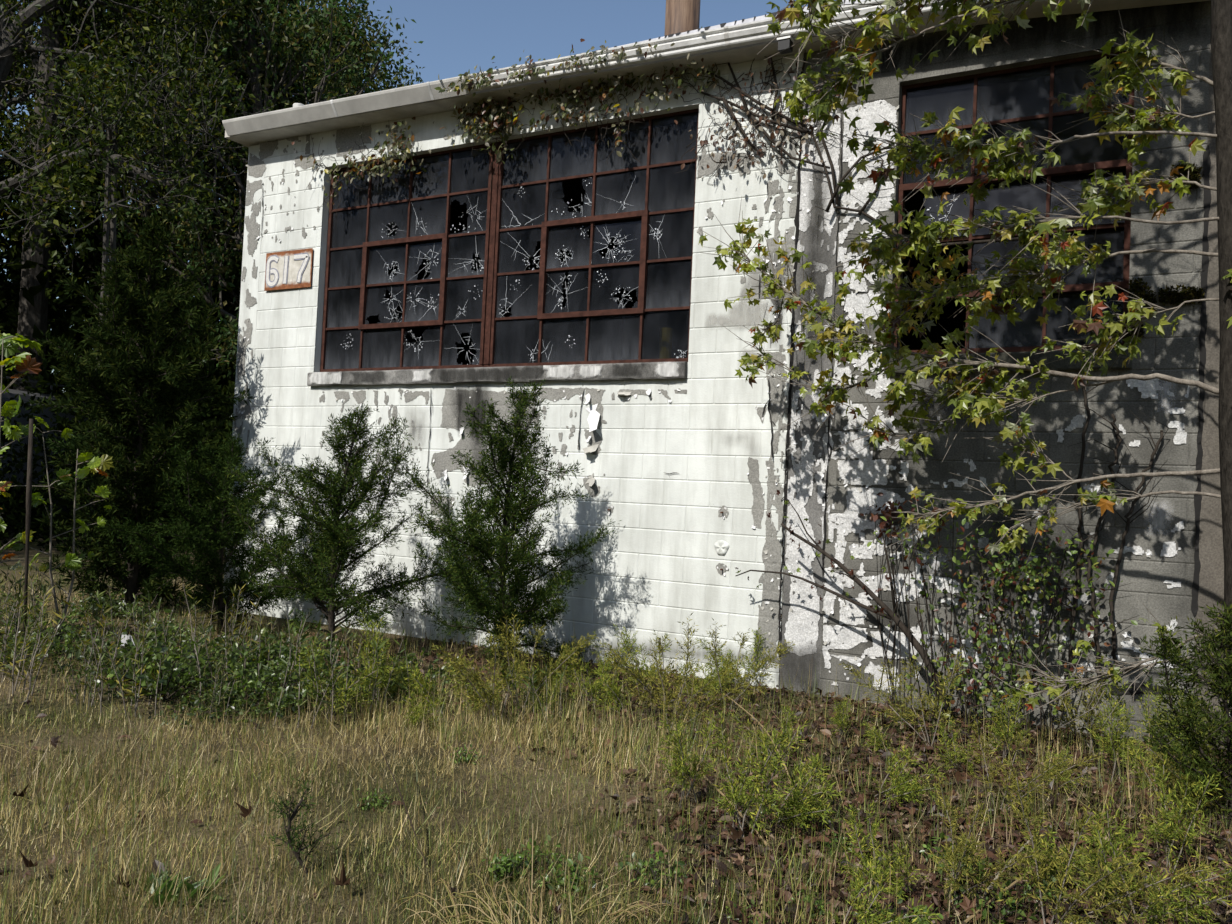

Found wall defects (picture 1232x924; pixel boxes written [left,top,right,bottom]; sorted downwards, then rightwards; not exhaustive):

peeling [234,121,401,456]
peeling [310,362,687,487]
peeling [697,100,1114,692]
peeling [1126,378,1189,444]
peeling [583,473,613,515]
peeling [1113,521,1184,557]
peeling [1046,619,1189,681]